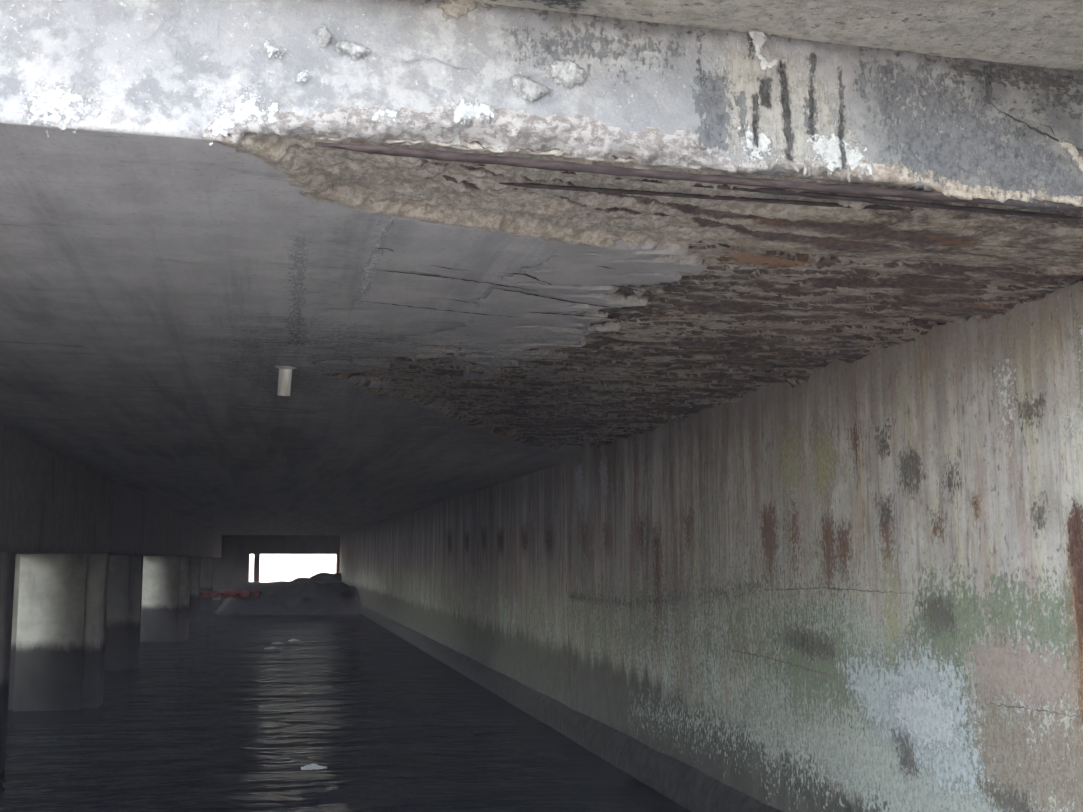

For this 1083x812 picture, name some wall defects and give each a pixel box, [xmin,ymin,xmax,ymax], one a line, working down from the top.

peeling [17,80,104,132]
leakage [503,0,1083,209]
crack [989,102,1083,171]
peeling [203,83,1083,450]
rust [759,498,805,590]
rust [819,514,853,595]
rust [1067,501,1083,725]
crack [979,702,1083,718]
leakage [891,727,919,781]
leakage [975,778,1035,812]